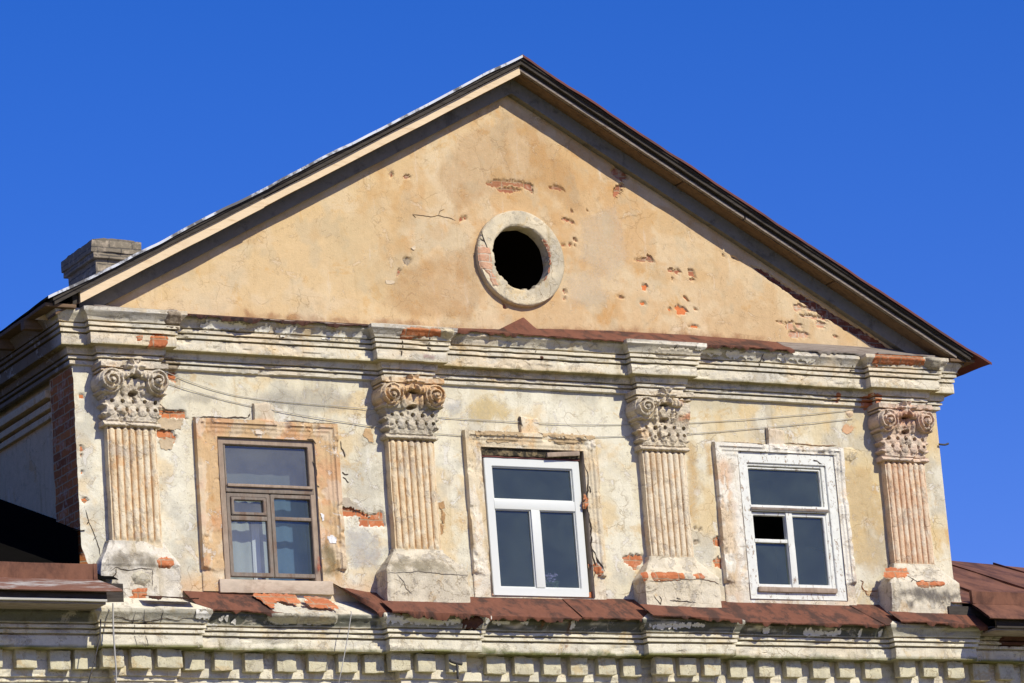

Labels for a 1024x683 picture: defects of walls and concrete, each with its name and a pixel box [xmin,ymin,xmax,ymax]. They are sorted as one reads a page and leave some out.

flaking render [486,180,532,194]
flaking render [477,245,499,287]
peeling [200,319,297,337]
peeling [321,331,367,342]
spalling [399,326,441,340]
flaking render [754,268,925,368]
flaking render [653,343,756,361]
flaking render [157,410,185,450]
spalling [342,497,384,527]
spalling [622,554,705,581]
spalling [883,567,945,588]
flaking render [253,593,339,610]